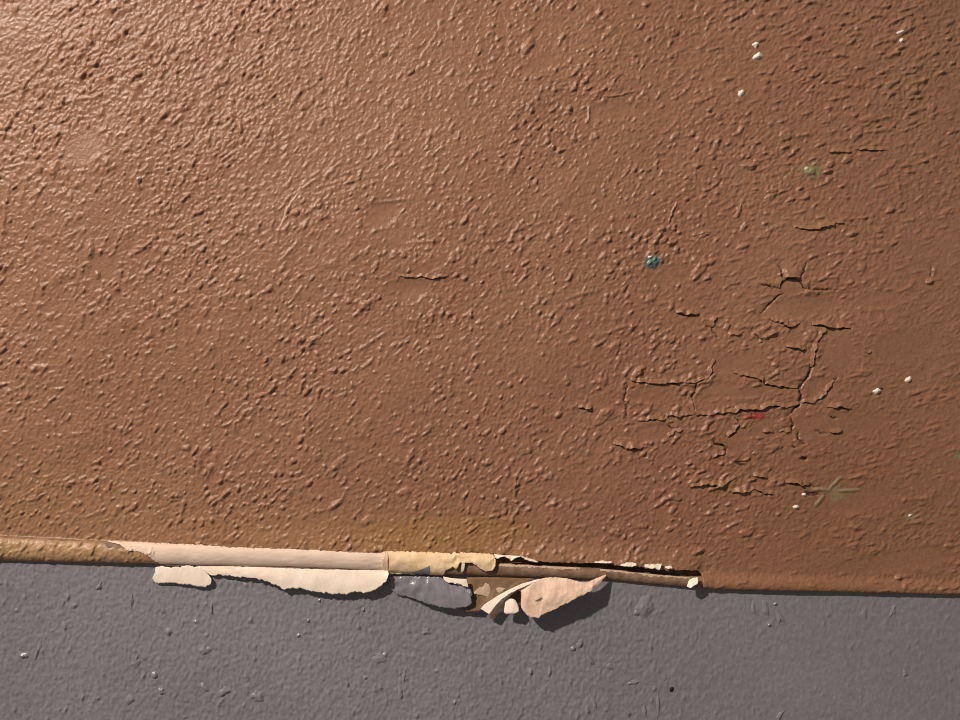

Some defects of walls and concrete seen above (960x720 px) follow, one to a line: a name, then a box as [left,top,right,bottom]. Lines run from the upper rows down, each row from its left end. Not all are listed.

crack [398,272,448,280]
crack [613,264,852,496]
peeling [108,541,703,620]